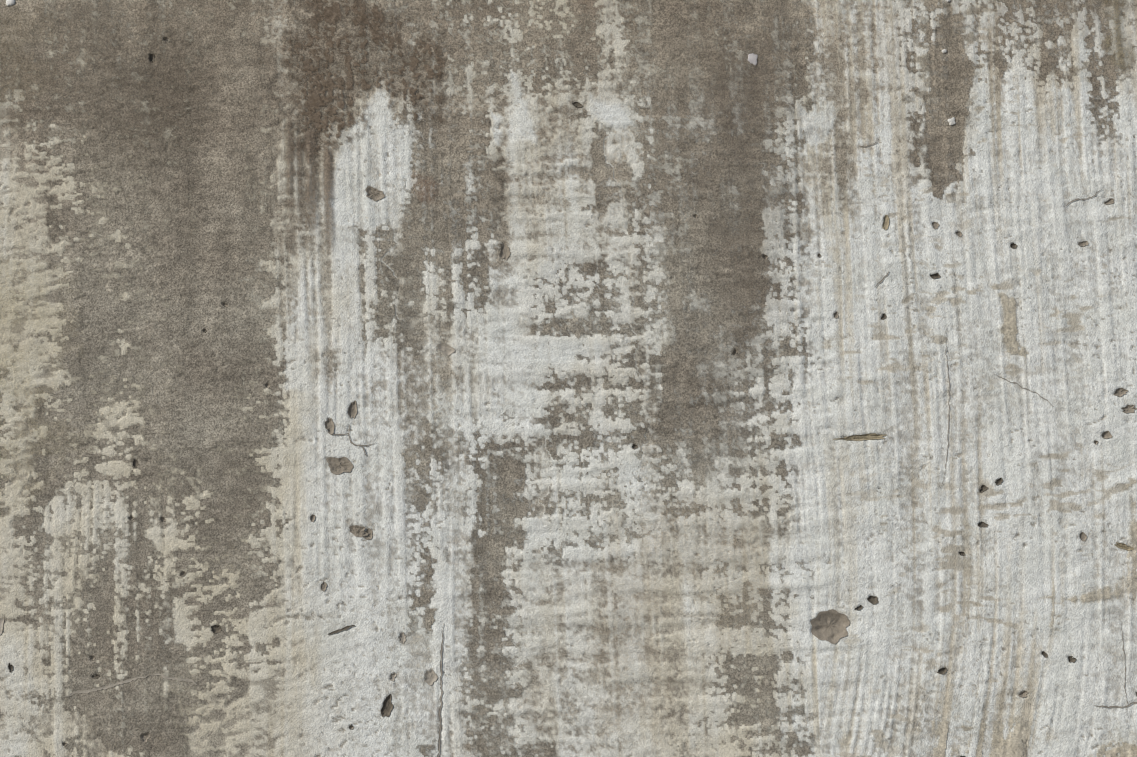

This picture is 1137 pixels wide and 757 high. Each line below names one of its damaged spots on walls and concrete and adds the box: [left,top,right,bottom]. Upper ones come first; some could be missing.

water stain [1104,0,1130,69]